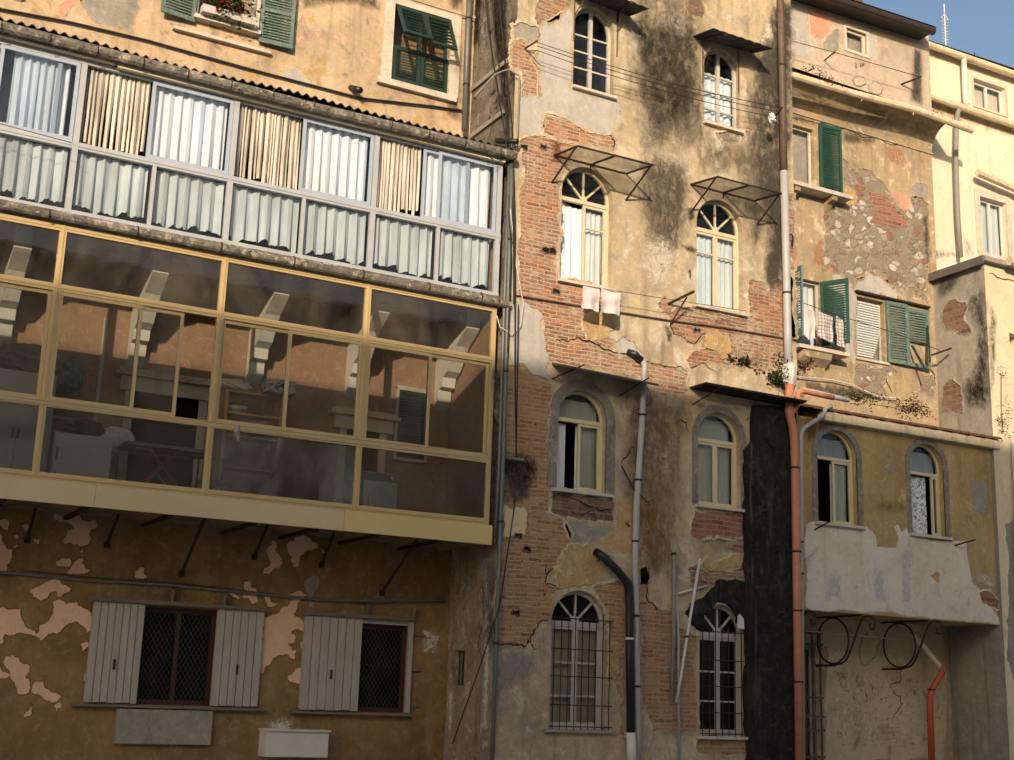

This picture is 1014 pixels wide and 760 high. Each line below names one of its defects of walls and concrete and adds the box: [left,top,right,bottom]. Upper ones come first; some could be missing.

flaking render [508,36,543,99]
damp [639,26,697,128]
damp [749,5,808,285]
damp [642,158,687,255]
flaking render [839,186,912,230]
flaking render [491,111,800,650]
damp [966,294,995,404]
peeling [0,511,100,719]
peeling [133,566,148,580]
peeling [227,580,307,686]
peeling [261,534,330,575]
crack [478,588,546,675]